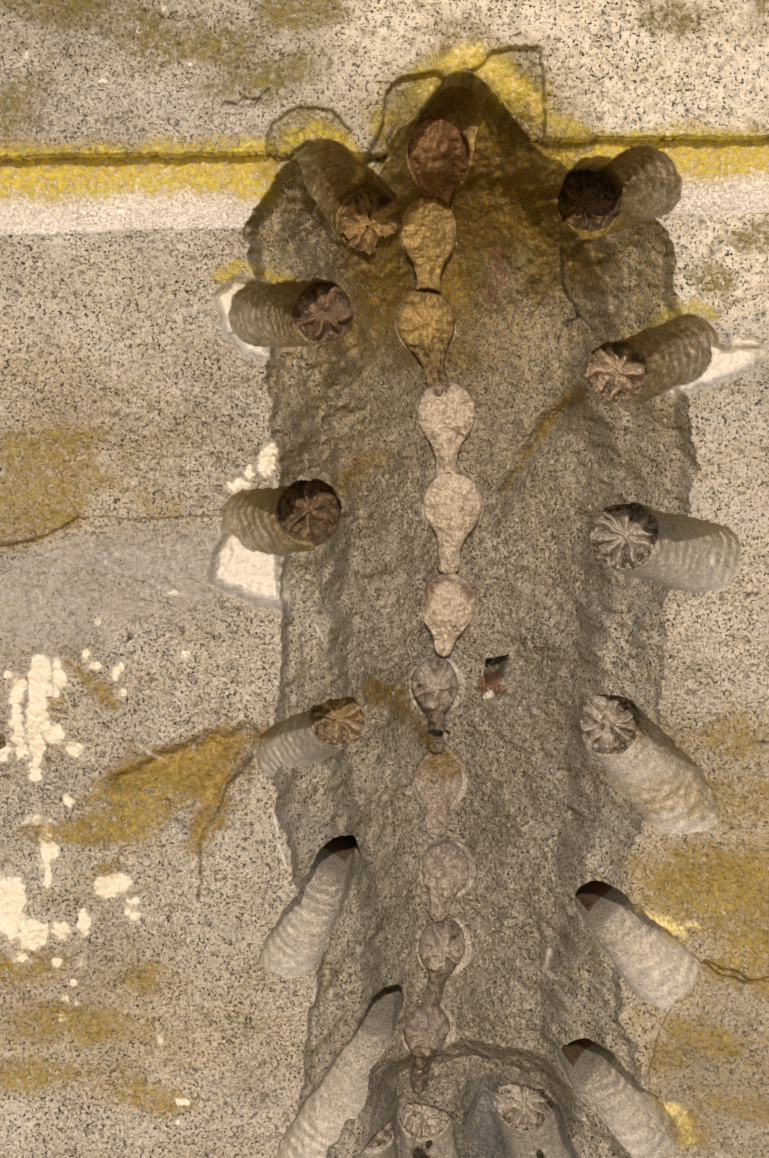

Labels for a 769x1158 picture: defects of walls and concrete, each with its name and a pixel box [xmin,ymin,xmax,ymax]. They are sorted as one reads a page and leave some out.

crack [217,755,252,810]
damp [21,793,119,889]
damp [89,859,145,921]
damp [0,872,92,983]
damp [18,979,127,1045]
damp [0,1059,74,1091]
damp [112,1078,190,1125]